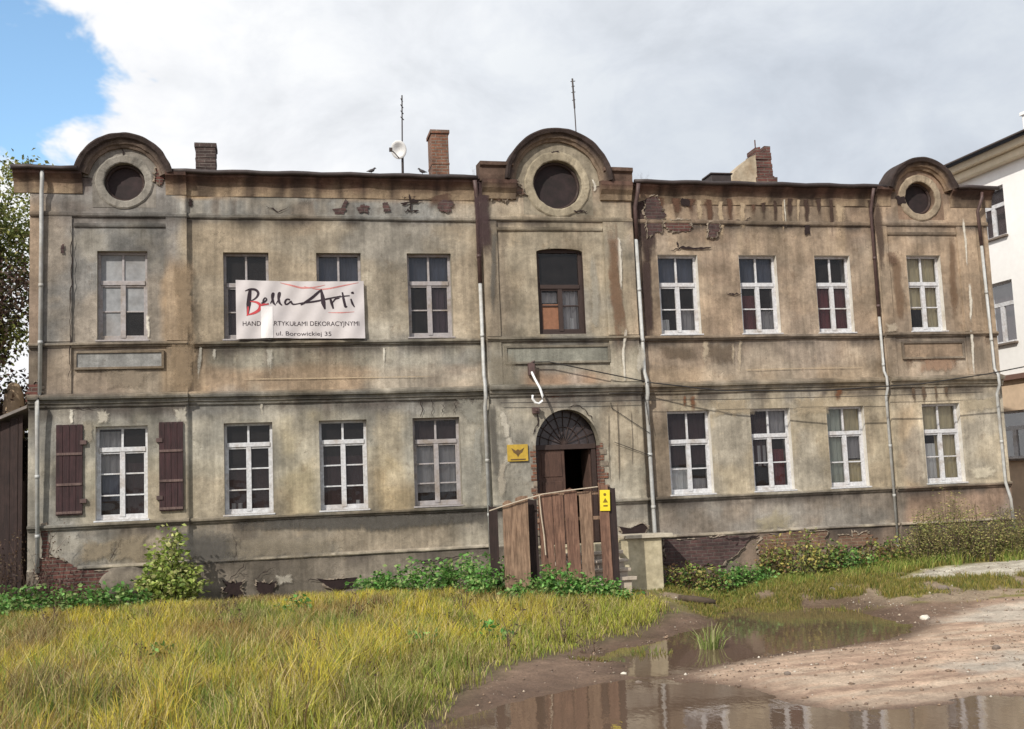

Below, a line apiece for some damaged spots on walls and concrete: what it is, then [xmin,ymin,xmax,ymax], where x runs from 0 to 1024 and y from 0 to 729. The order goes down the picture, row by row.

spalling [333,199,391,215]
spalling [437,199,454,213]
spalling [641,194,693,239]
water stain [761,198,844,229]
spalling [706,221,722,240]
spalling [34,522,108,599]
spalling [662,530,878,569]
spalling [221,578,278,600]
spalling [317,576,357,592]